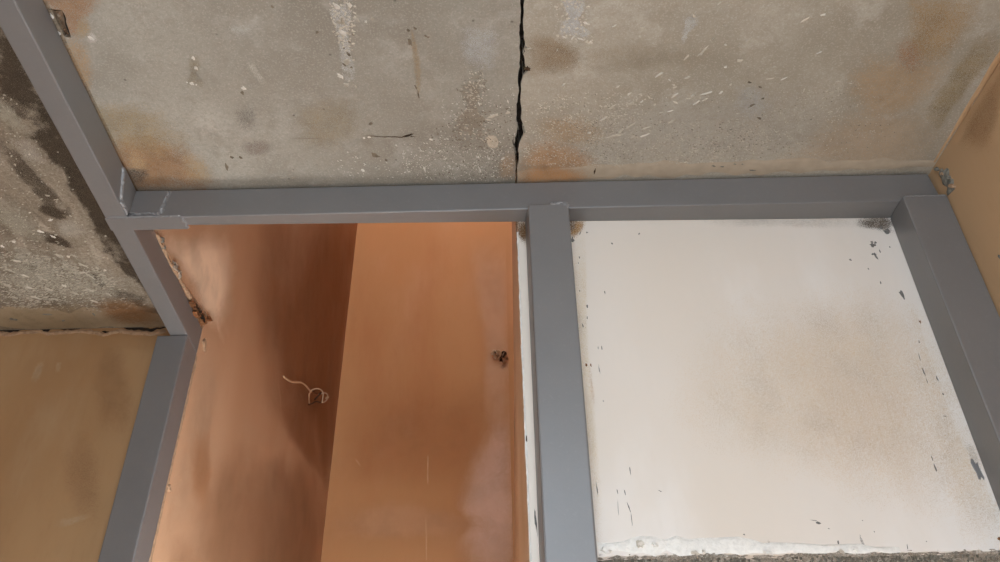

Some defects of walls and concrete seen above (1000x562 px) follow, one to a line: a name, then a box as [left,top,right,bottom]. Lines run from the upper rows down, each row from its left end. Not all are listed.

damp [0,28,164,329]
flaking render [156,233,213,326]
crack [512,0,530,182]
damp [662,280,1000,560]